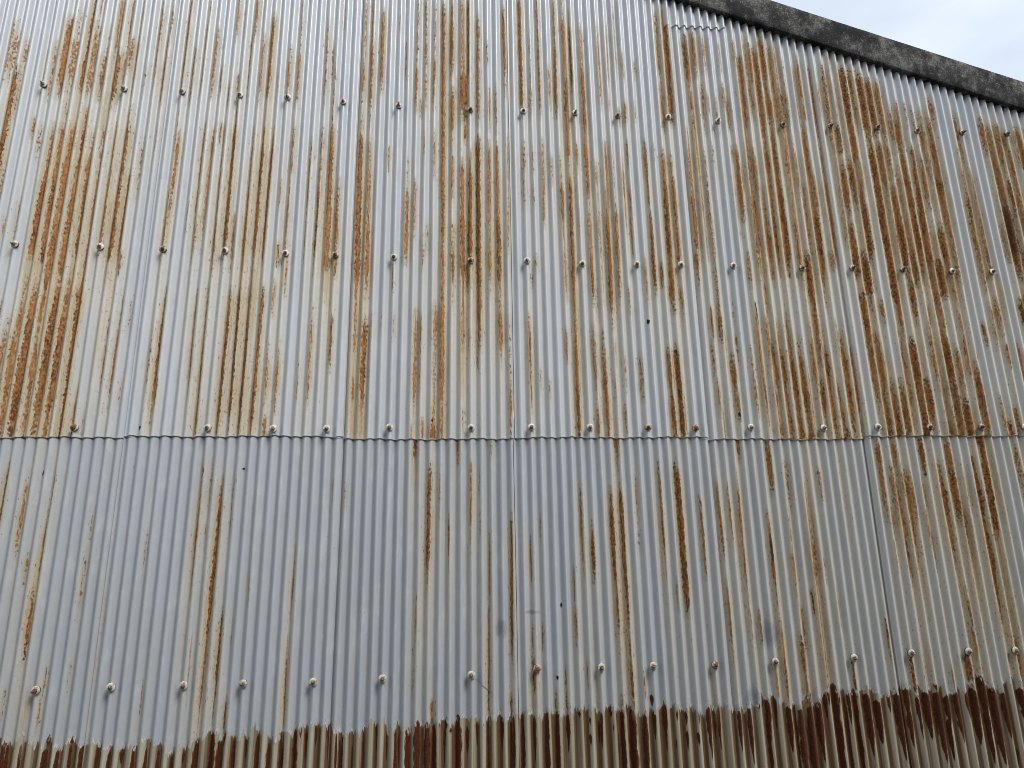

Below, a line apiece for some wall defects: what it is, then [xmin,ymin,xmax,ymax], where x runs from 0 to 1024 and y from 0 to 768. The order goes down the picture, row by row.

rust [0,0,401,437]
rust [279,637,290,745]
rust [391,0,646,719]
rust [642,7,1024,719]